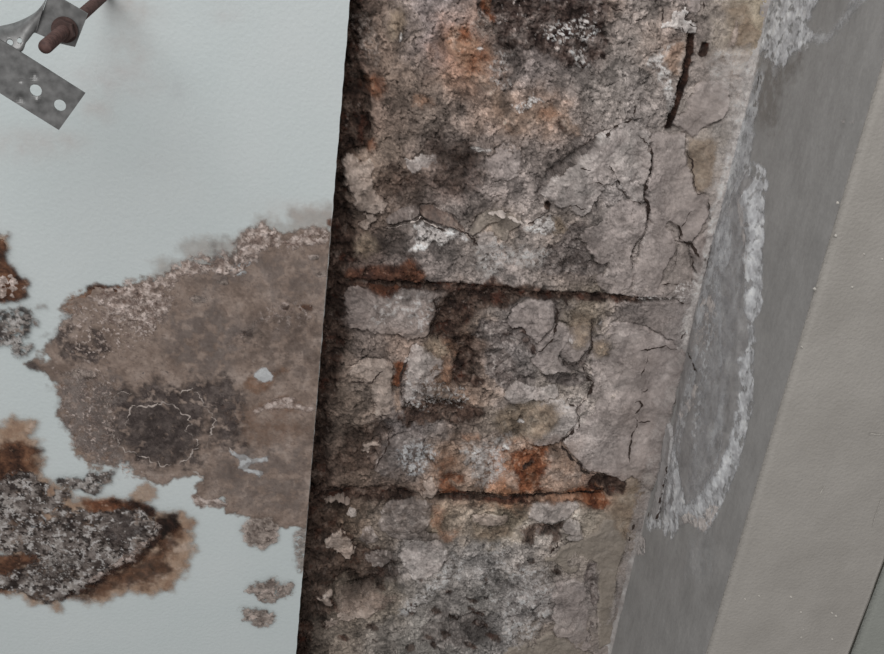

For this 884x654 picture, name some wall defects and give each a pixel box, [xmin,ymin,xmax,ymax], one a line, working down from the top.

damp [0,221,330,573]
crack [351,351,410,398]
rust [346,258,425,297]
crack [416,217,478,245]
rust [485,276,544,296]
crack [552,320,603,475]
crack [581,98,654,268]
crack [537,150,711,353]
crack [628,332,697,462]
damp [609,63,769,621]
rust [432,451,470,500]
rust [481,436,610,509]